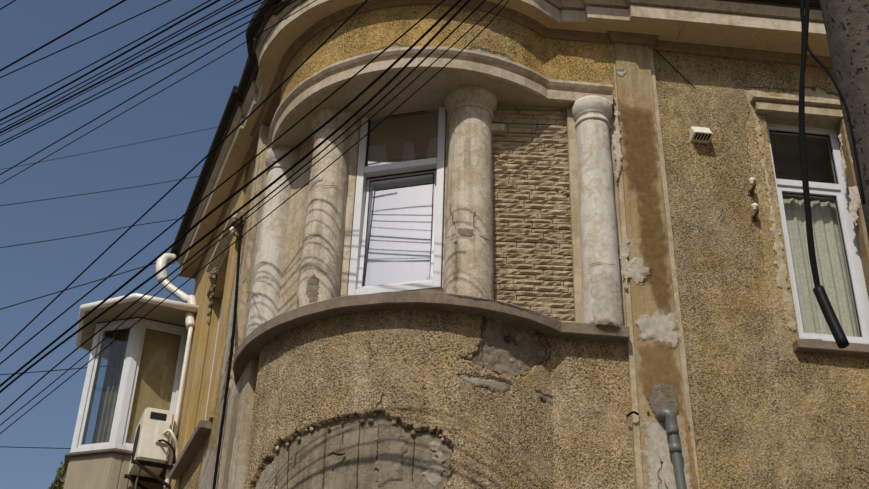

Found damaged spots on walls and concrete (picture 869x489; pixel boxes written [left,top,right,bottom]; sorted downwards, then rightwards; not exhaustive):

flaking render [611,111,623,179]
flaking render [743,85,840,334]
flaking render [838,134,861,226]
flaking render [297,274,320,308]
flaking render [458,316,551,393]
flaking render [590,235,652,326]
flaking render [635,309,680,347]
flaking render [255,391,454,489]
flaking render [640,383,692,489]